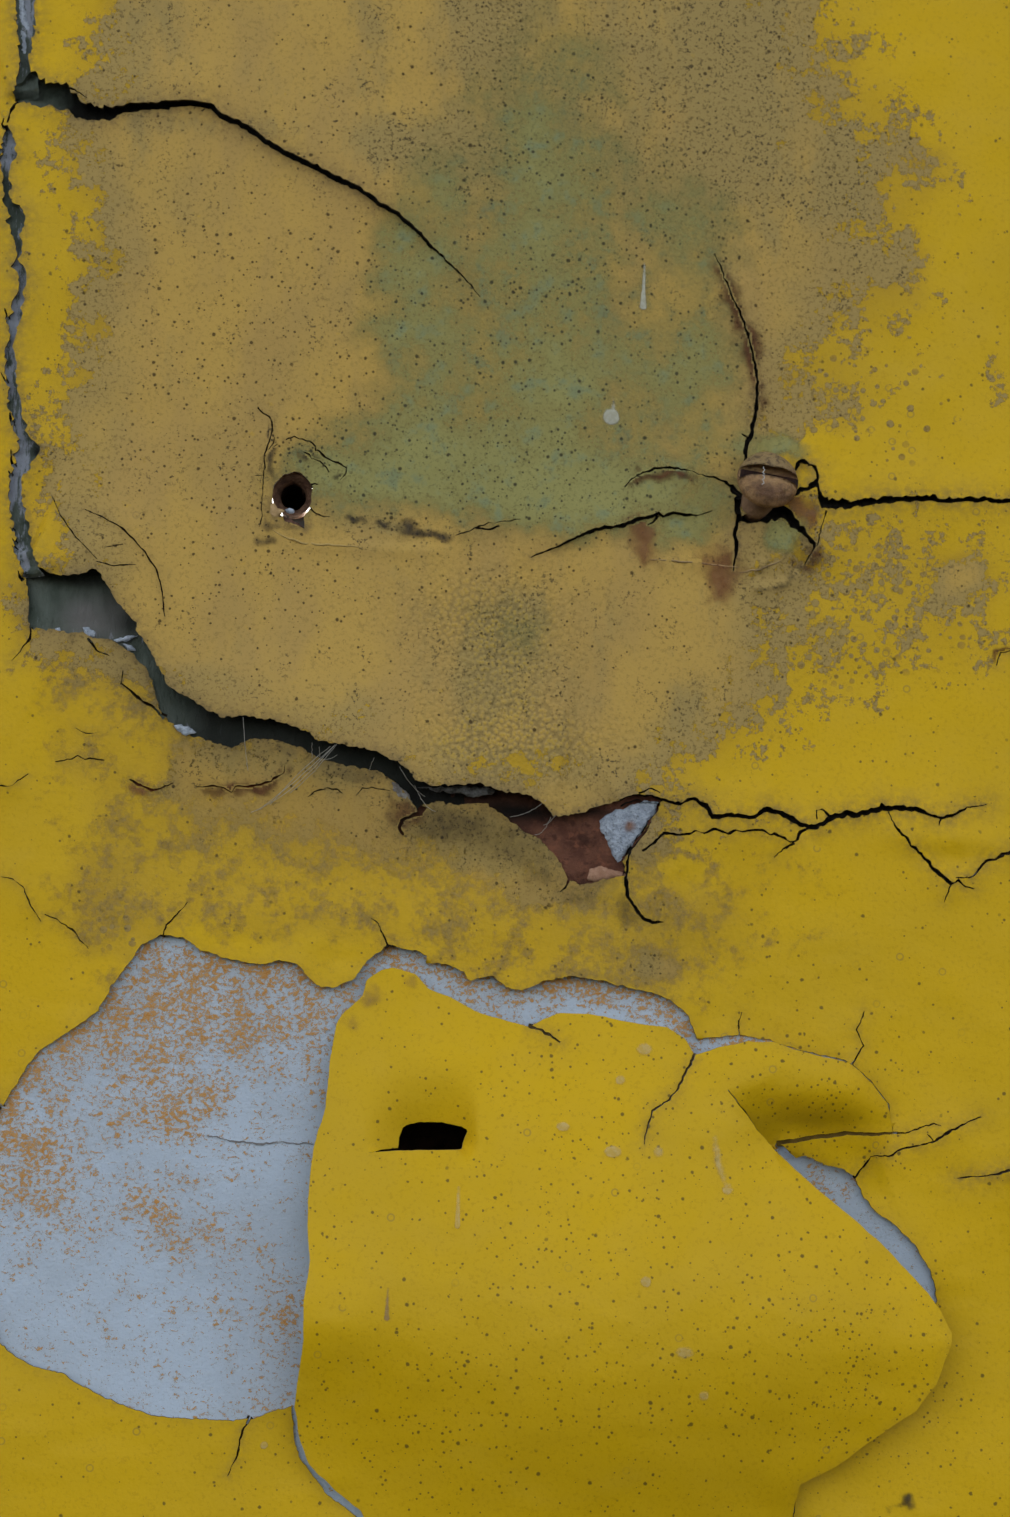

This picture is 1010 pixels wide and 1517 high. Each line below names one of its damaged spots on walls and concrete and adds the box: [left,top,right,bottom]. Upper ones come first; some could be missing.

crack [0,0,480,617]
crack [531,264,1010,571]
crack [458,519,518,535]
crack [88,640,167,717]
crack [0,728,427,836]
crack [619,788,1010,924]
peeling [0,935,889,1517]
peeling [774,1145,937,1303]
crack [852,1117,980,1179]
crack [957,1169,1010,1179]